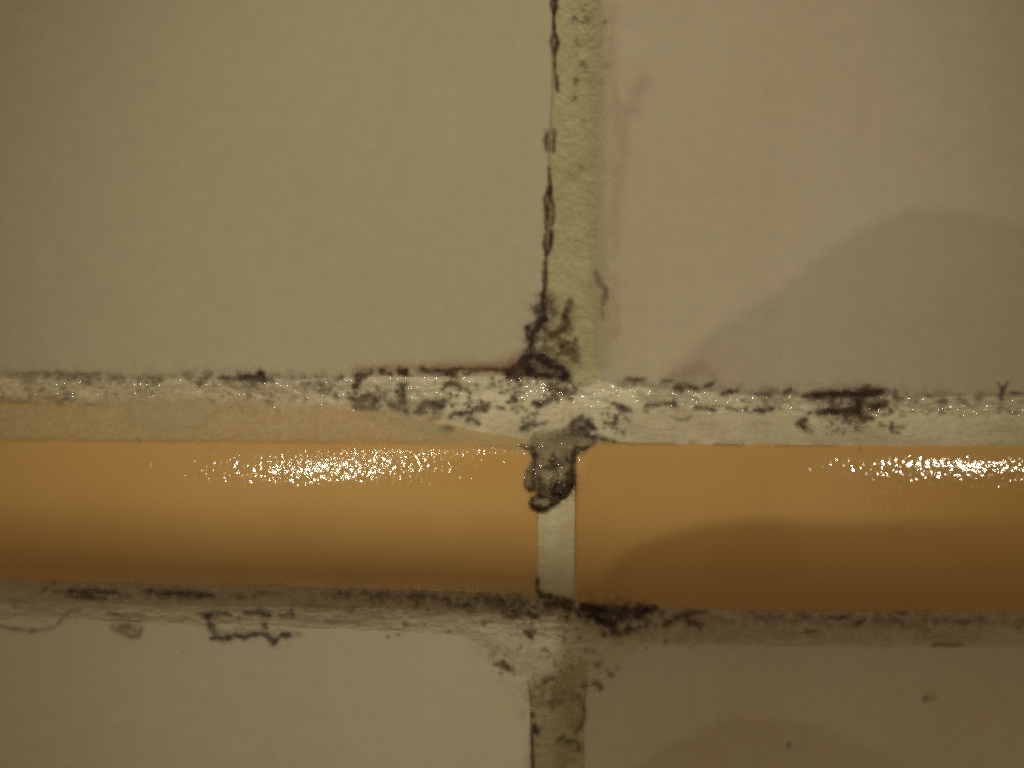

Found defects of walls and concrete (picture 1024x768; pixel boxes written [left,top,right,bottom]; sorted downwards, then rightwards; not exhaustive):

damp [551,0,559,66]
damp [543,175,553,254]
damp [220,370,266,381]
damp [797,385,893,428]
damp [520,403,631,512]
damp [204,611,290,644]
damp [524,579,657,638]